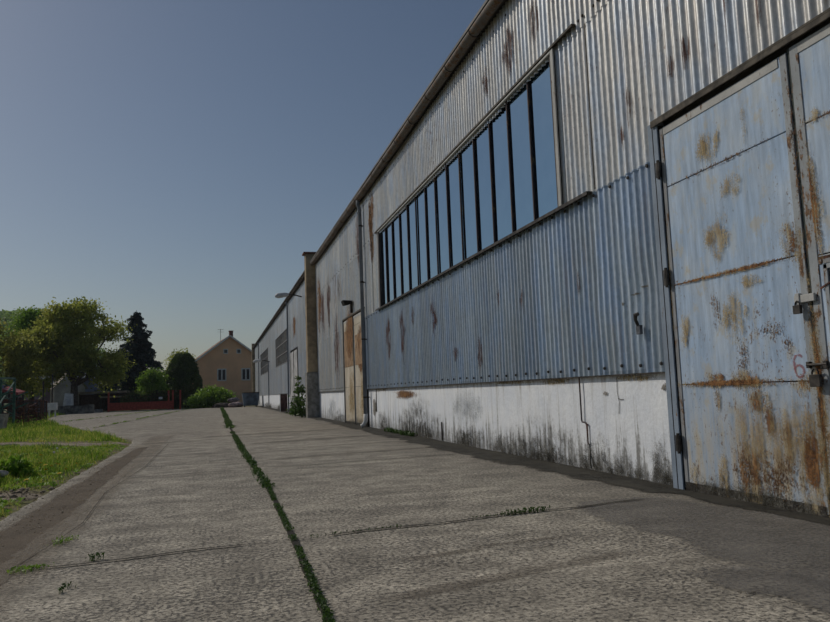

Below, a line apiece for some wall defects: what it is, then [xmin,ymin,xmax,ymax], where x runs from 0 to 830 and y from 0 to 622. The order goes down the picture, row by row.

rust [502,29,515,76]
rust [528,0,539,45]
rust [671,132,750,186]
rust [788,95,830,259]
rust [668,222,804,346]
rust [317,269,363,426]
leakage [455,426,673,485]
rust [678,295,830,513]